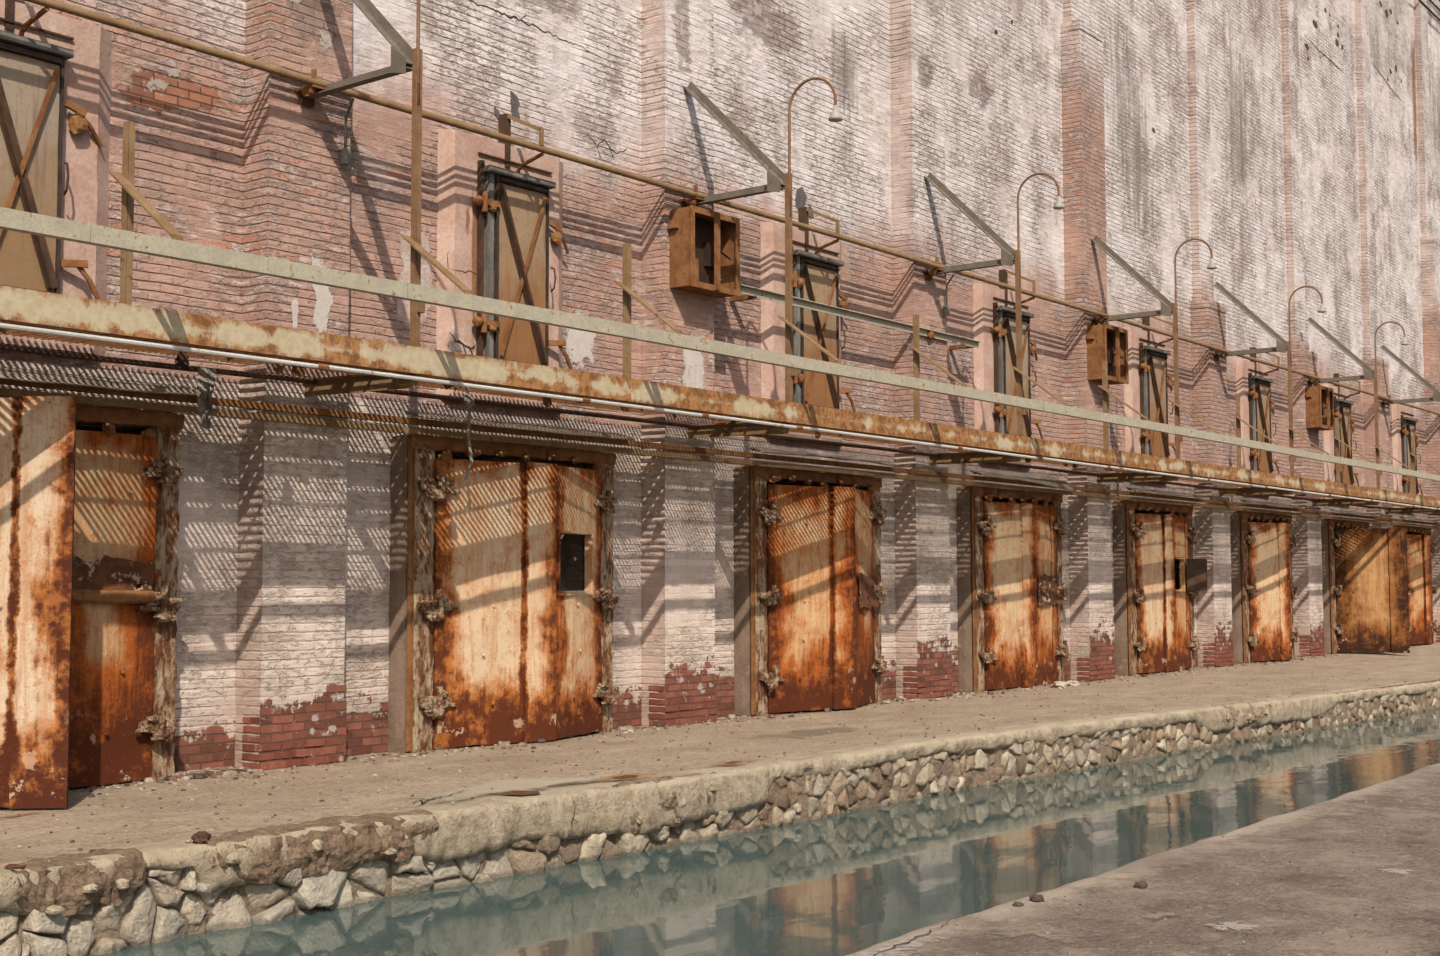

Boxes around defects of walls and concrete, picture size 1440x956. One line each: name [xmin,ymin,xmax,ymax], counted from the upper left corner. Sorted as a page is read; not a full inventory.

peeling [116,66,220,115]
peeling [174,720,235,772]
peeling [258,675,388,770]
peeling [613,685,642,729]
peeling [665,655,735,726]
peeling [882,660,896,700]
peeling [917,626,959,699]